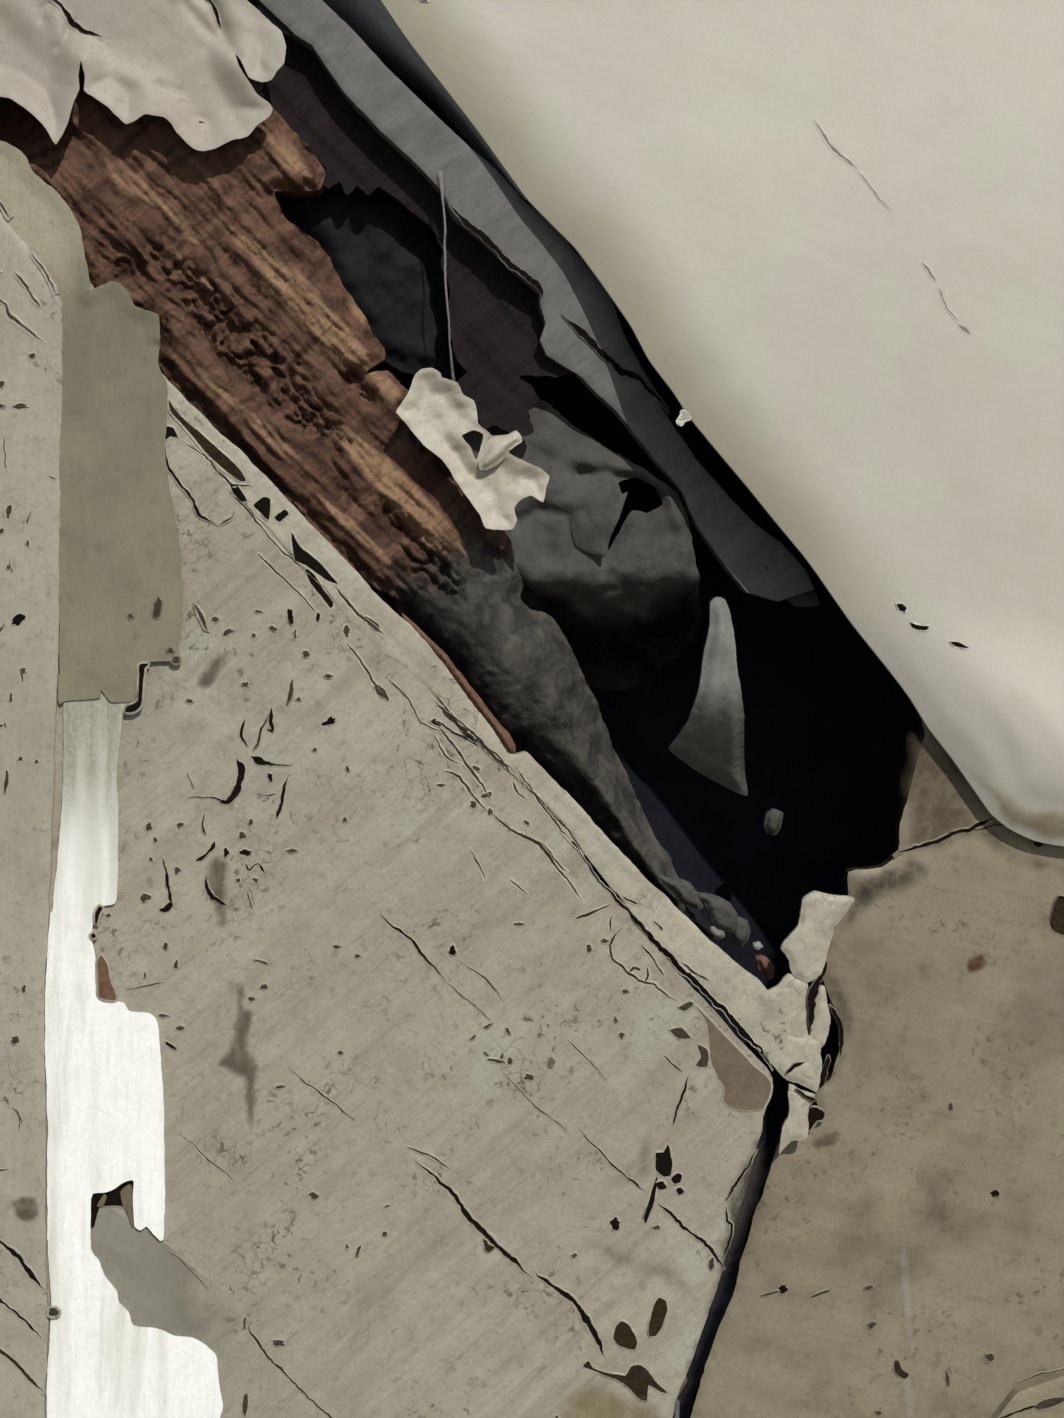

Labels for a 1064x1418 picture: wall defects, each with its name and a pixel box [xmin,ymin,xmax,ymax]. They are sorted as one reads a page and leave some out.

peeling [0,0,290,151]
crack [812,118,893,211]
crack [921,261,972,336]
peeling [0,141,391,715]
peeling [368,353,550,530]
peeling [895,602,931,633]
spalling [429,283,921,1154]
peeling [89,904,118,1002]
leakage [222,1012,255,1111]
peeling [91,1180,202,1340]
crack [403,1145,608,1359]
crack [982,1367,1064,1418]